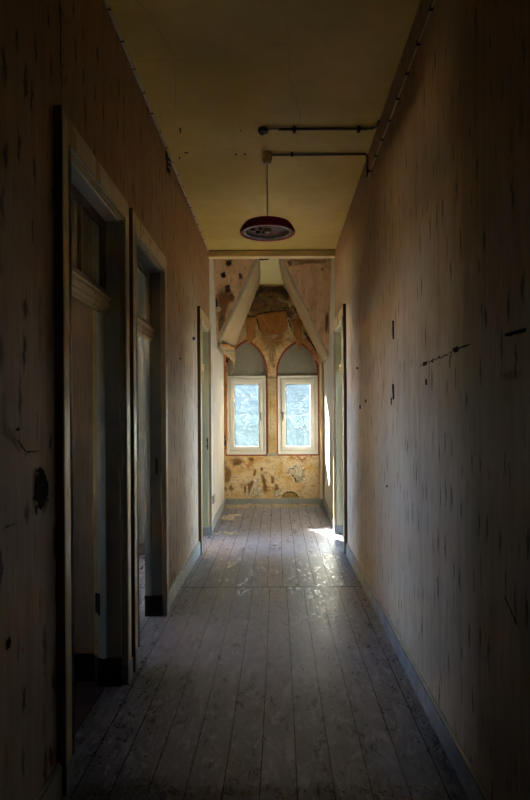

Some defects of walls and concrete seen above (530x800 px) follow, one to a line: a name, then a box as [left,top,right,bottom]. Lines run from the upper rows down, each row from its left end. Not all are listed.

flaking render [33,467,50,515]
flaking render [280,463,307,498]